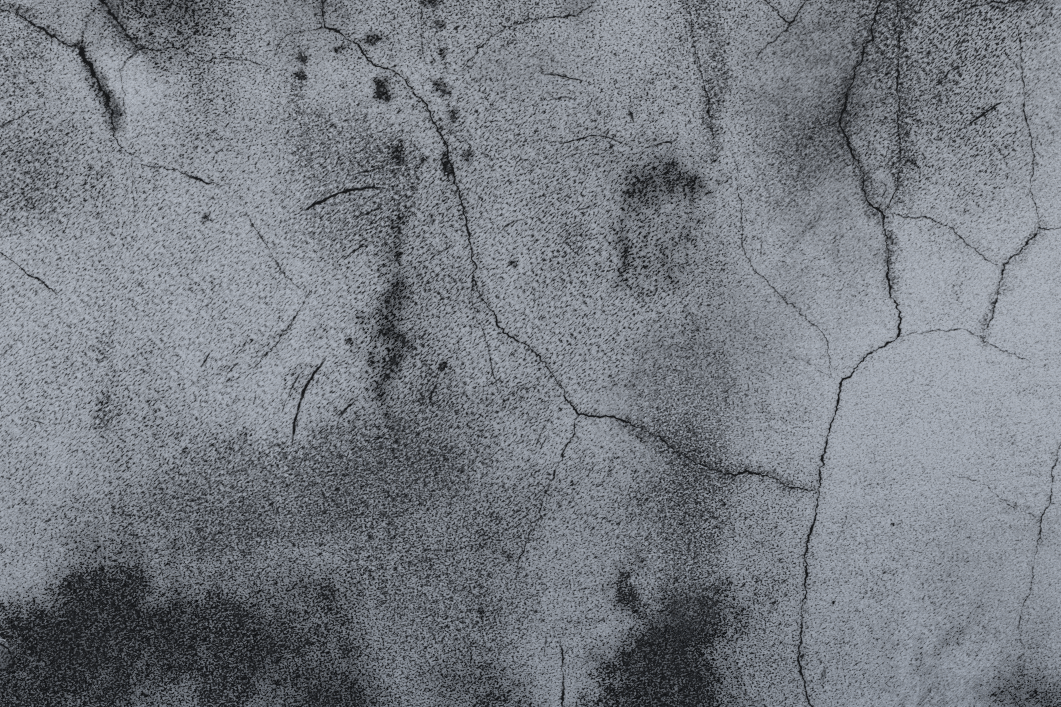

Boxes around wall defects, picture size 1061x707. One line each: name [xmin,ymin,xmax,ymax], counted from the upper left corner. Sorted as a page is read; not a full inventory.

crack [0,0,267,213]
crack [0,252,56,294]
crack [246,213,310,375]
crack [274,0,1061,707]
leakage [0,389,492,707]
leakage [385,573,549,707]
leakage [569,361,757,707]